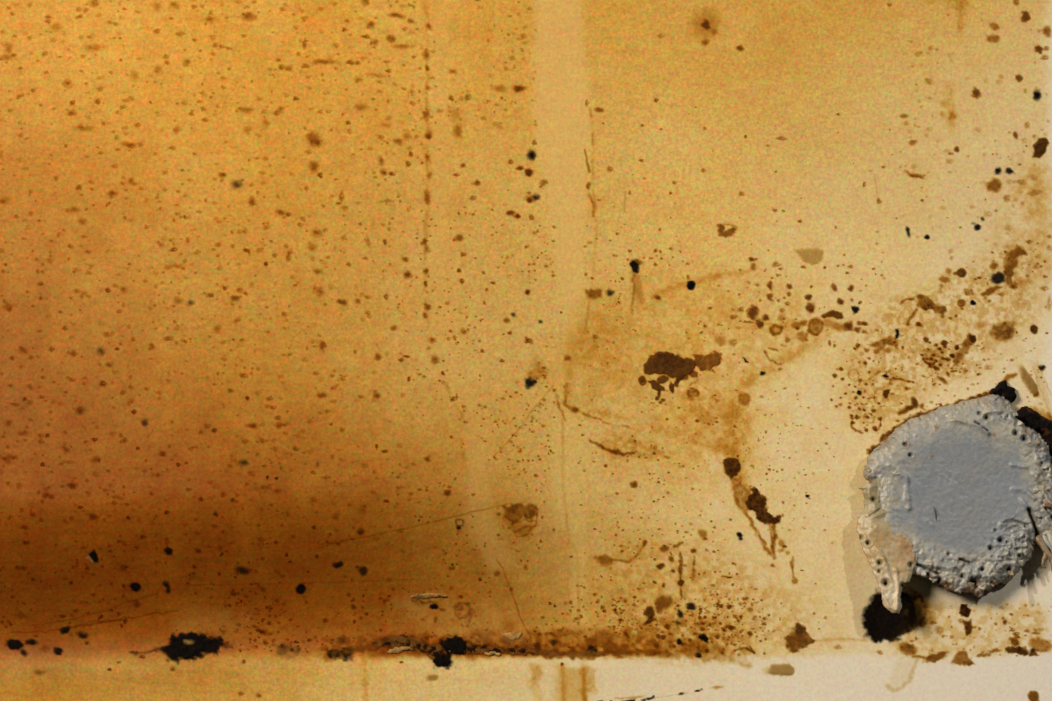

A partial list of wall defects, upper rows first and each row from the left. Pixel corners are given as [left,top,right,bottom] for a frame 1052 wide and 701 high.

water stain [991,272,1004,284]
corrosion [723,458,740,479]
corrosion [746,487,786,547]
peeling [856,468,995,614]
water stain [7,639,23,649]
water stain [161,631,223,663]
water stain [327,647,353,661]
water stain [372,635,502,669]